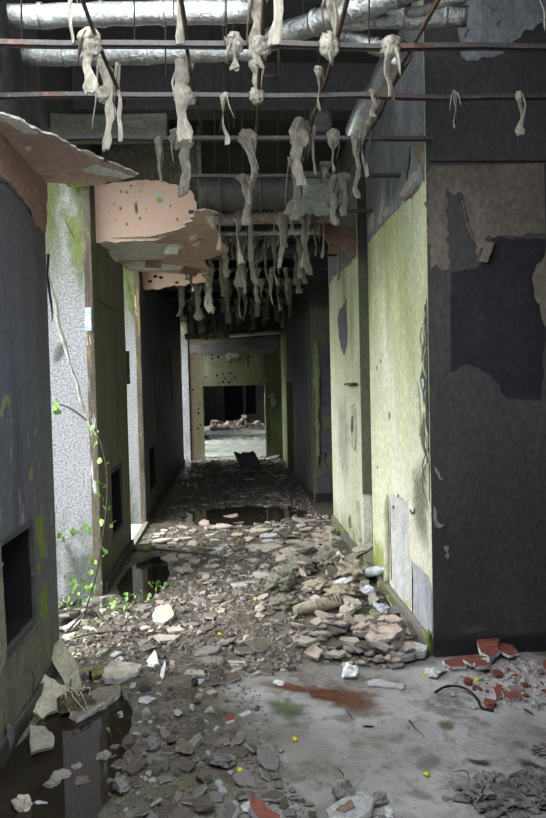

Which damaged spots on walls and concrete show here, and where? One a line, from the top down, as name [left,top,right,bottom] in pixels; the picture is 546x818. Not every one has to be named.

peeling [0,116,38,135]
peeling [0,134,48,234]
peeling [82,150,135,179]
peeling [100,234,202,277]
peeling [313,244,356,464]
peeling [329,30,425,243]
peeling [416,298,430,504]
peeling [450,237,546,401]